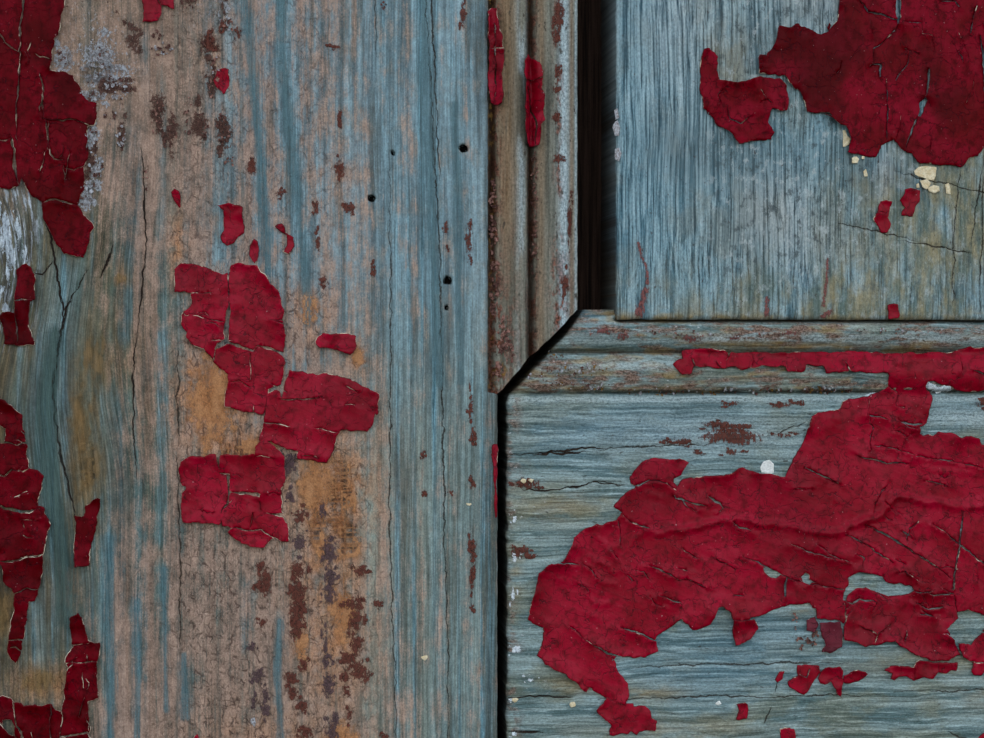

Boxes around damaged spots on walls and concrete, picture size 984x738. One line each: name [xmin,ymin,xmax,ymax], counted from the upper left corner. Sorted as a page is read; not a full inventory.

peeling [0,0,127,258]
peeling [487,0,505,105]
peeling [699,0,984,233]
crack [838,171,984,311]
peeling [174,203,380,548]
peeling [0,399,51,663]
peeling [73,498,100,567]
peeling [528,325,984,736]
peeling [0,613,100,738]
crack [510,727,543,735]
crack [508,692,572,700]
crack [598,661,984,723]